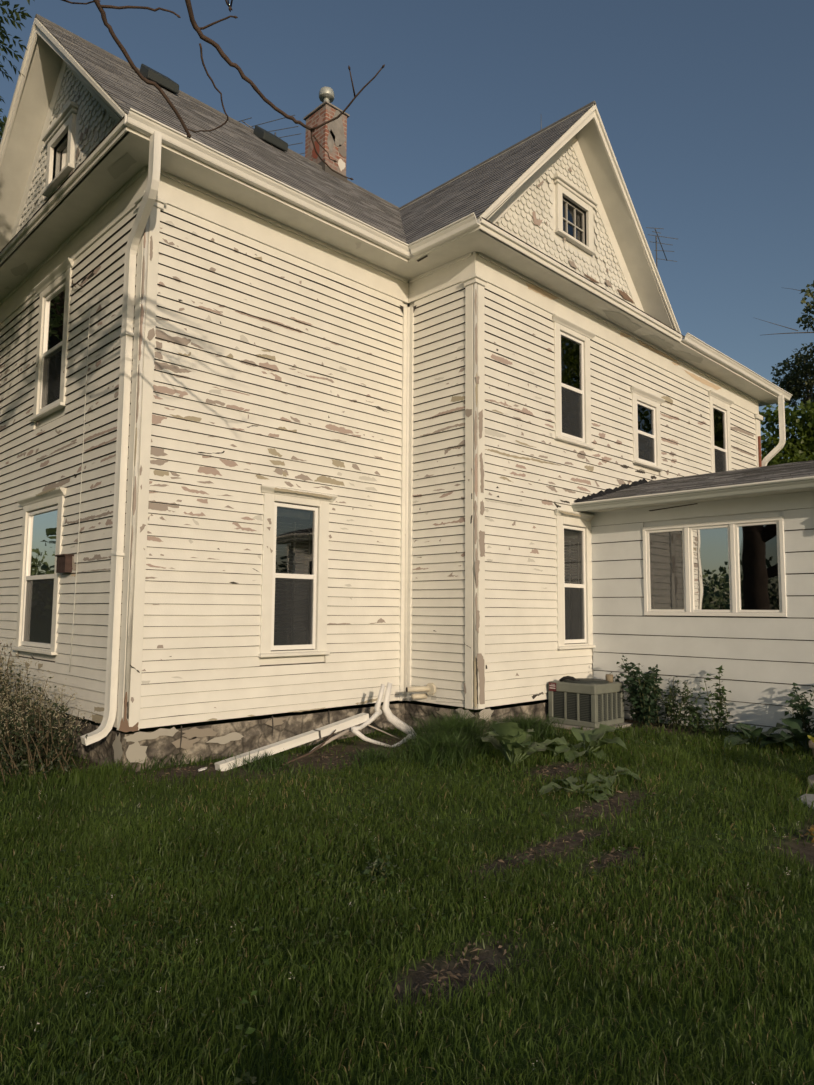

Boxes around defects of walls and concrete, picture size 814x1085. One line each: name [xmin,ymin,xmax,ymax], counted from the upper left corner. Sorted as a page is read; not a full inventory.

peeling [42,475,70,492]
peeling [130,226,374,579]
peeling [413,290,623,633]